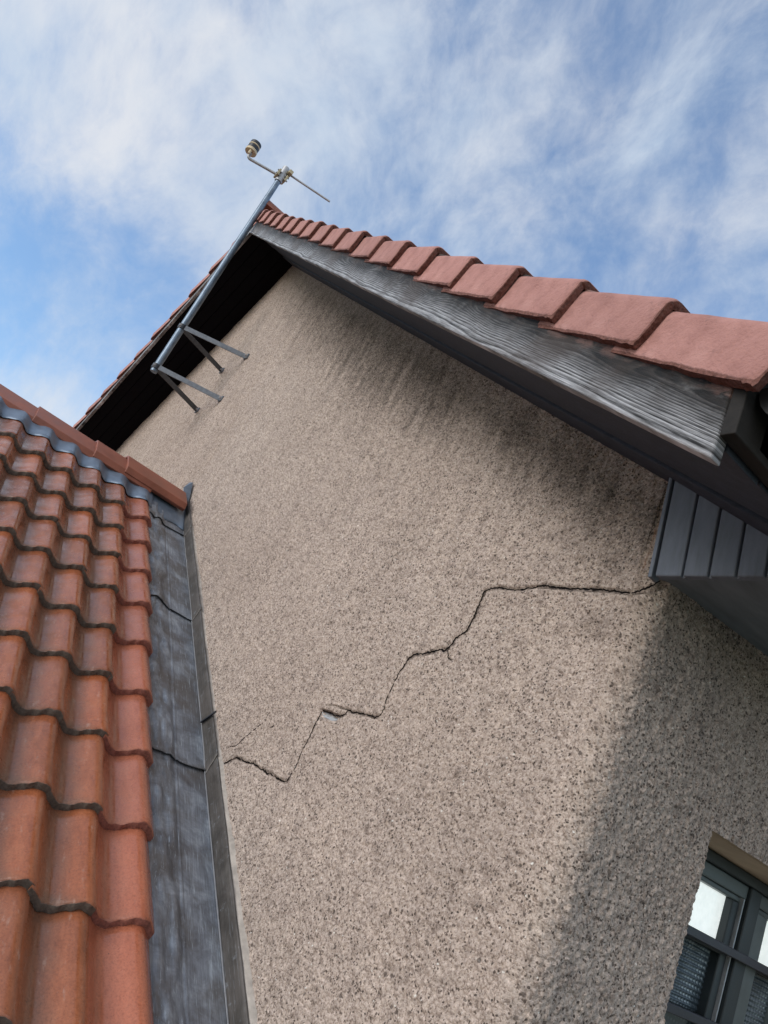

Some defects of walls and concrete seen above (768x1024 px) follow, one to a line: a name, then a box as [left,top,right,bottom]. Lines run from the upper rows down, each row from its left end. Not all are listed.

crack [223,581,660,782]